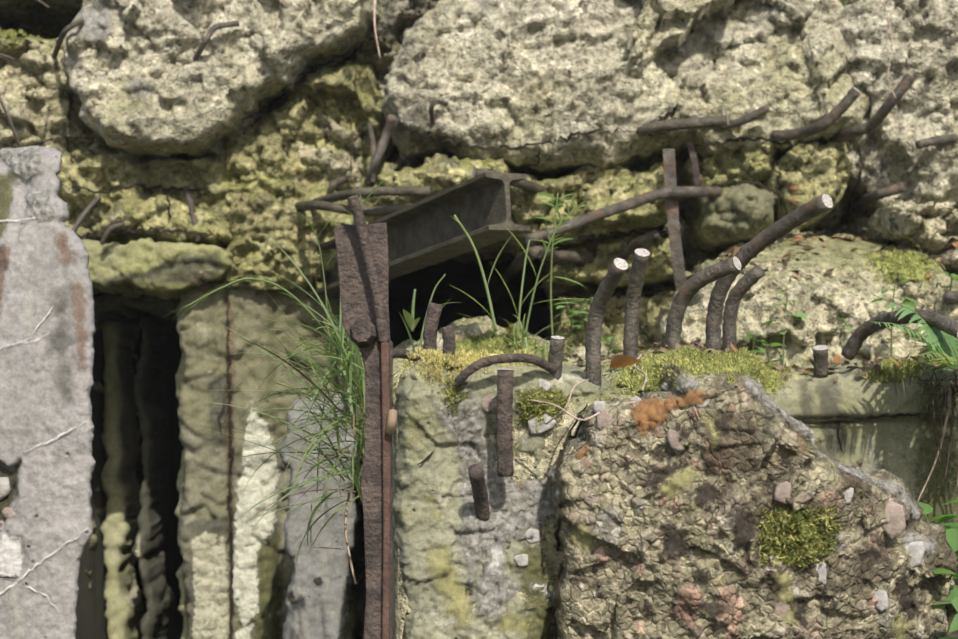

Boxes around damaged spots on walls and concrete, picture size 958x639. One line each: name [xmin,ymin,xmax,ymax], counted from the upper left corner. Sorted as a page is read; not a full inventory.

crack [0,63,226,239]
crack [413,102,864,247]
rust [57,234,75,263]
rust [72,283,87,368]
rust [630,390,715,435]
spalling [0,462,23,577]
crack [551,404,590,639]